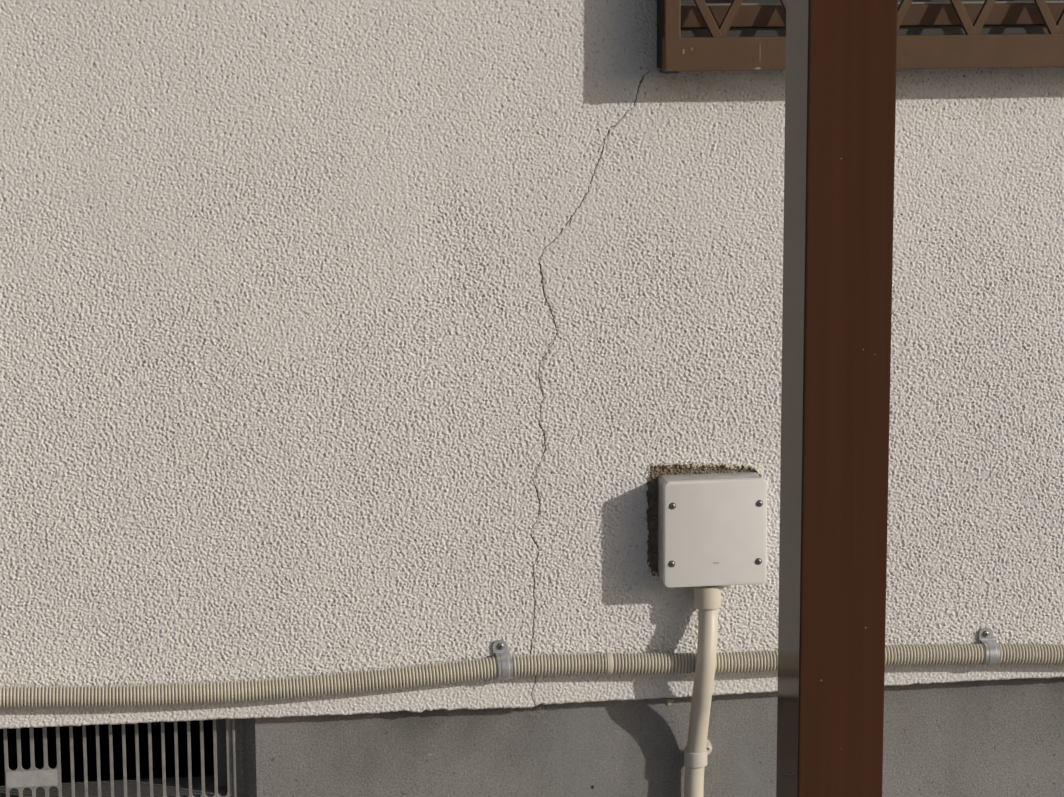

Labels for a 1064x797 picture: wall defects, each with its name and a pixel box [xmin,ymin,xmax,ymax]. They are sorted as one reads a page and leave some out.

crack [529,69,652,706]